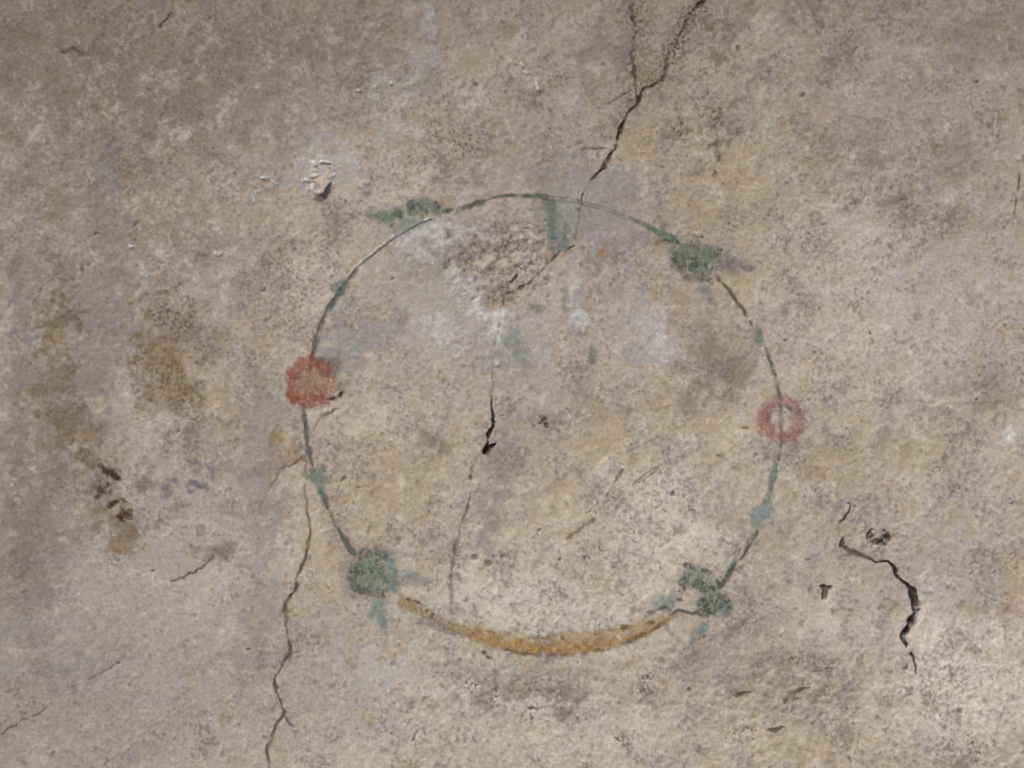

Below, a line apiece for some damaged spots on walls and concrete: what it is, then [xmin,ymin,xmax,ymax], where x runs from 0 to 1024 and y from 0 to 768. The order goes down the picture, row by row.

peeling [304,160,335,201]
crack [578,0,706,212]
crack [501,245,575,308]
crack [483,402,496,455]
crack [265,513,311,761]
crack [839,505,920,673]